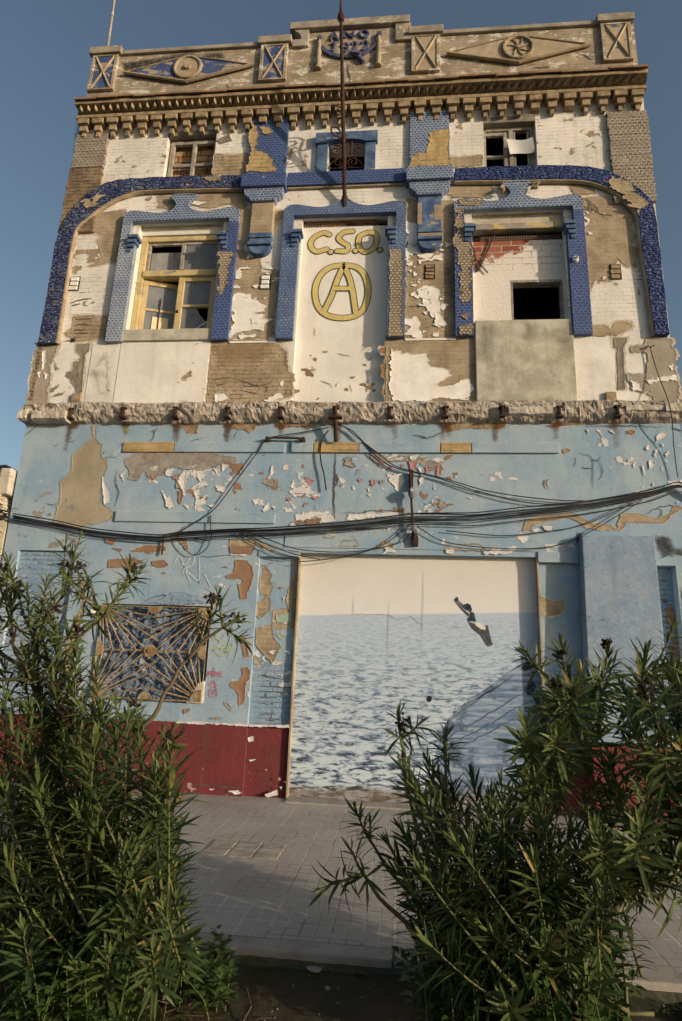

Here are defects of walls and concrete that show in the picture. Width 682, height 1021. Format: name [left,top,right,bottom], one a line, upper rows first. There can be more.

peeling [409,123,485,169]
peeling [191,122,328,403]
peeling [344,182,495,403]
peeling [25,301,109,404]
peeling [589,319,682,401]
peeling [102,476,111,504]
rust [265,423,306,442]
peeling [121,452,682,555]
crack [574,453,603,488]
peeling [175,539,299,742]